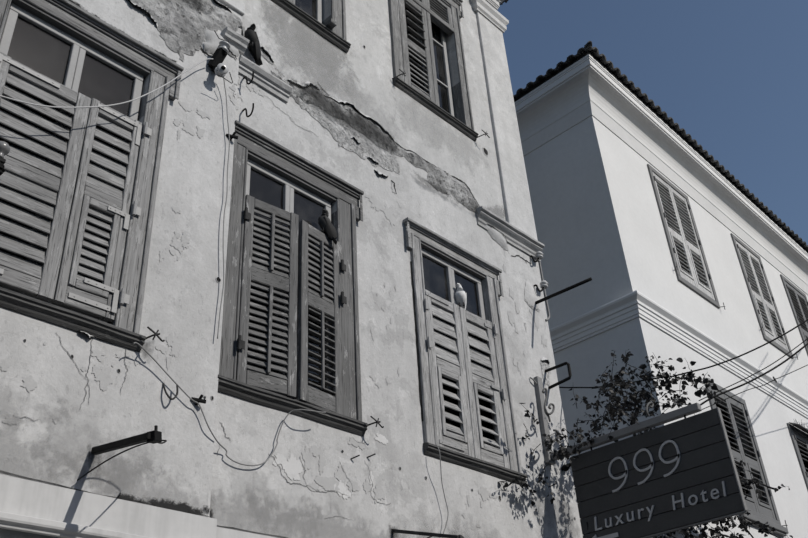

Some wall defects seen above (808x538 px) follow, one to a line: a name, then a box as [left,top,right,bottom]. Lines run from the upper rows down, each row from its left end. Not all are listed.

flaking render [128,0,245,61]
flaking render [260,45,480,213]
crack [56,333,93,408]